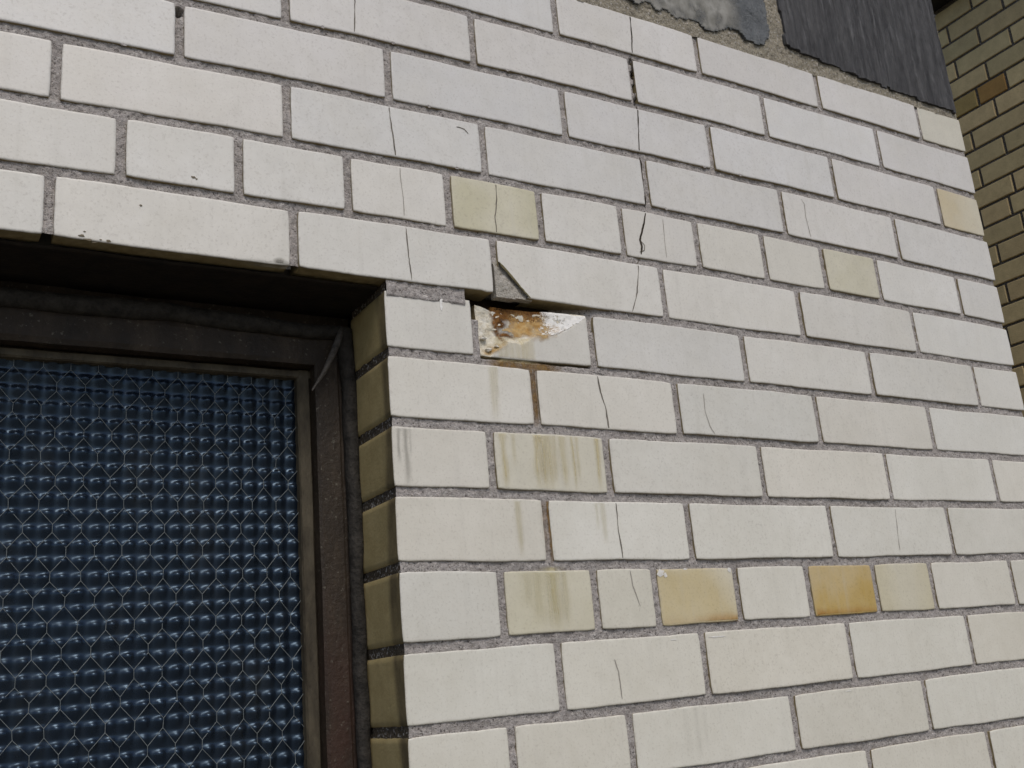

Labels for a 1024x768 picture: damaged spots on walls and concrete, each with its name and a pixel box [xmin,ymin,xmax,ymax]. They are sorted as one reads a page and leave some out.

crack [388,106,412,278]
crack [629,16,667,311]
spalling [471,259,605,375]
crack [597,376,609,428]
crack [616,504,640,604]